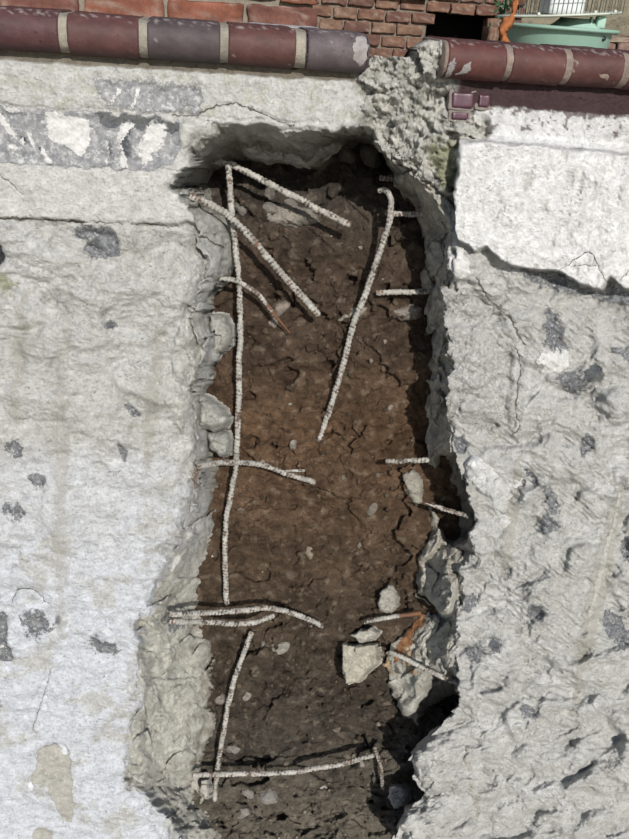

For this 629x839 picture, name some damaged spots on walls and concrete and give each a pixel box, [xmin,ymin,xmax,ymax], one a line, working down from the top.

crack [0,216,179,227]
crack [558,252,629,285]
spalling [317,175,427,442]
crack [476,277,526,435]
spalling [157,159,385,802]
spalling [425,503,475,521]
spalling [364,611,421,624]
corrosion [382,614,426,675]
spalling [388,650,459,685]